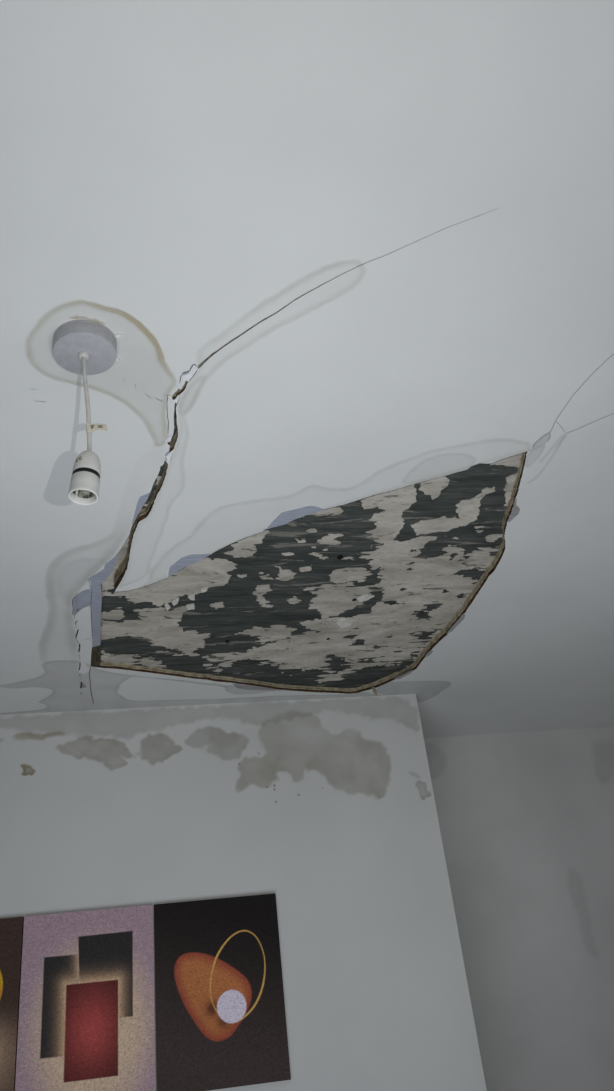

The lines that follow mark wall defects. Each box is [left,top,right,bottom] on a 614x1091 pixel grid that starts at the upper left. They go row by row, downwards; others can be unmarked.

leakage [94,305,164,364]
crack [89,209,495,647]
spalling [72,451,527,700]